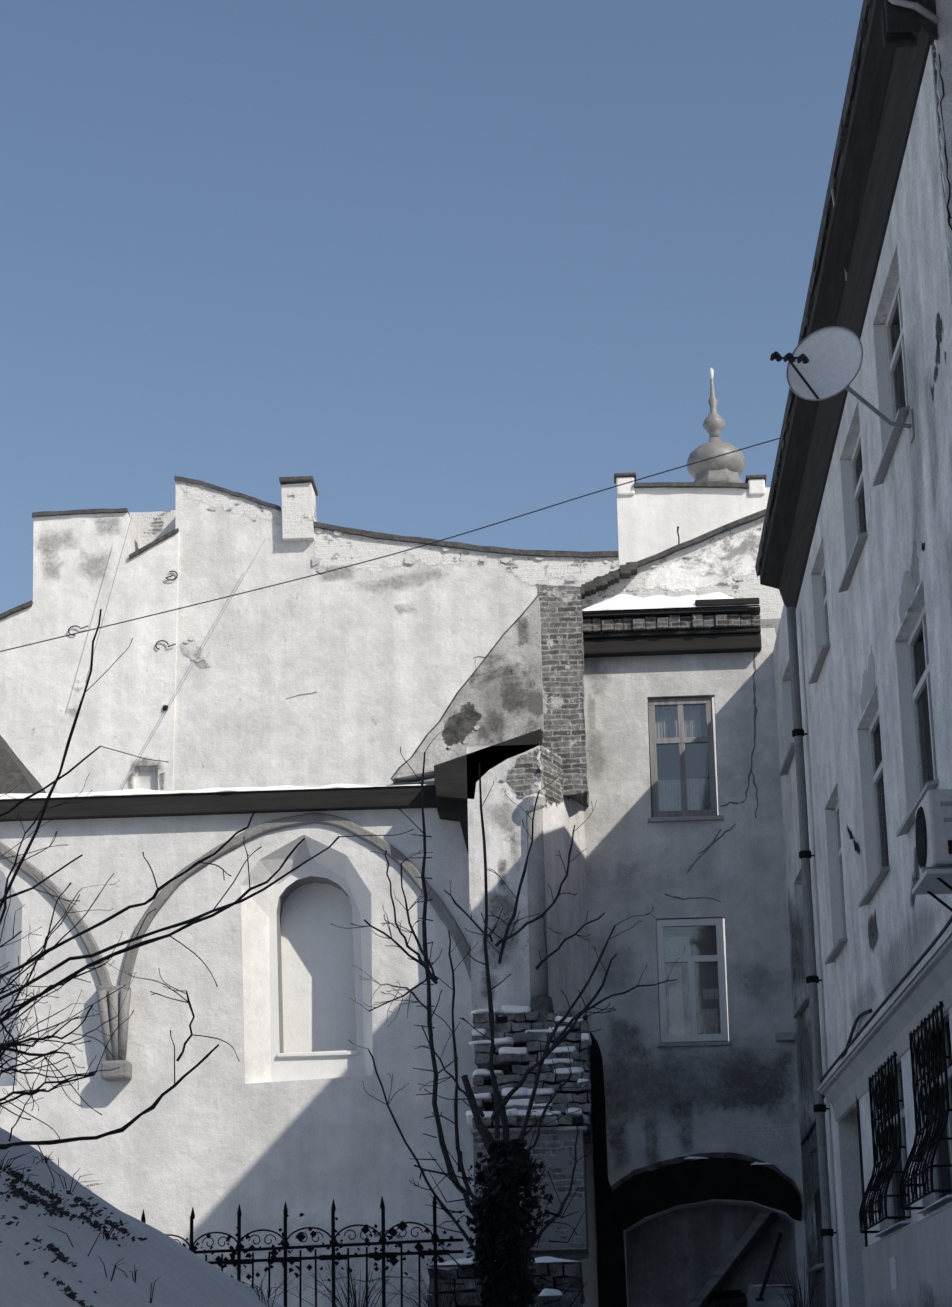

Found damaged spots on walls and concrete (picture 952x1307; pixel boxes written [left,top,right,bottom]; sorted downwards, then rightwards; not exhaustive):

crack [938,54,952,230]
peeling [312,523,763,599]
flaking render [500,742,570,807]
crack [665,652,758,902]